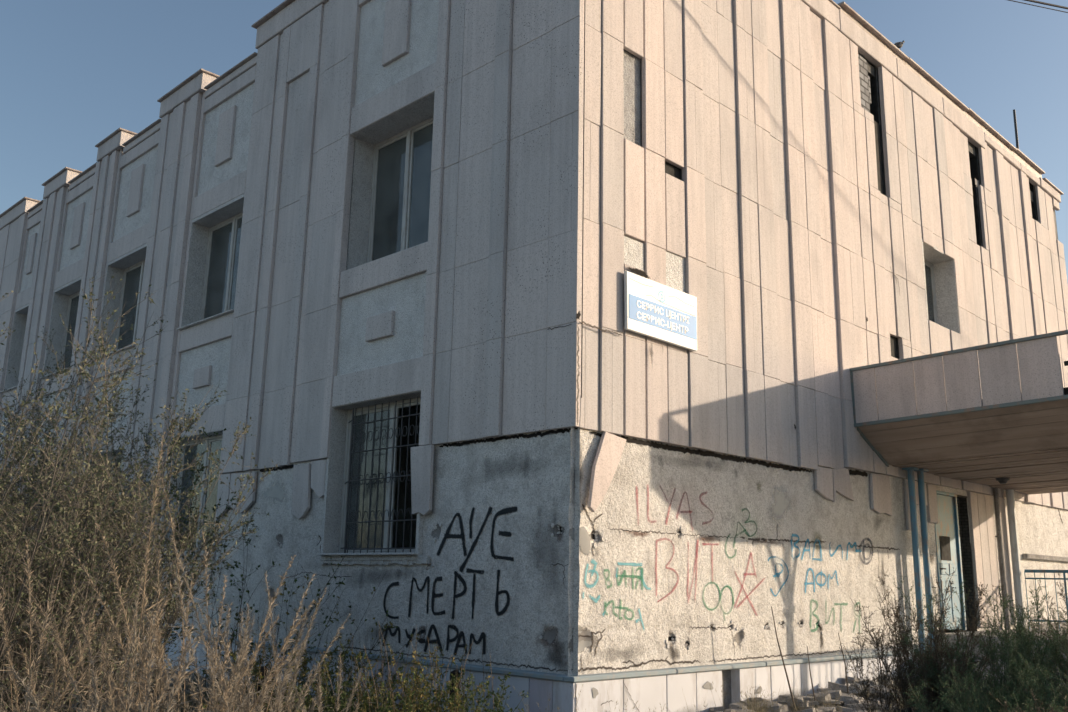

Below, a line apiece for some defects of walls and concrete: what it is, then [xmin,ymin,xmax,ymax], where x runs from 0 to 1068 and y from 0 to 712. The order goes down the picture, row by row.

peeling [624,236,644,270]
peeling [666,251,685,293]
crack [548,321,622,424]
crack [582,504,900,563]
spalling [539,621,598,653]